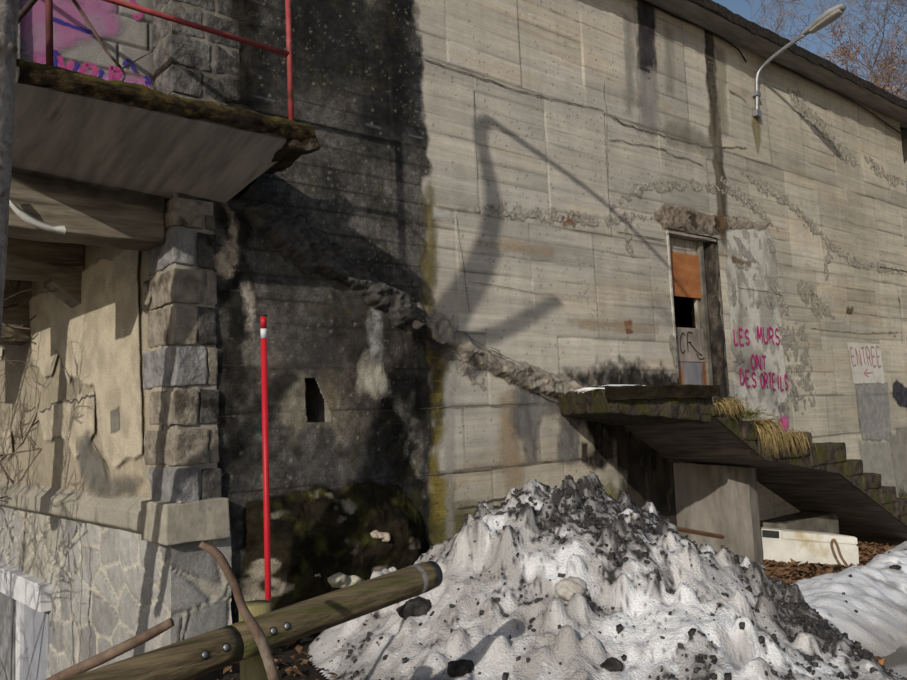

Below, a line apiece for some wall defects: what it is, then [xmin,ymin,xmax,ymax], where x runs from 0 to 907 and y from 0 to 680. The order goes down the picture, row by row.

crack [423,58,746,181]
leakage [625,0,672,134]
leakage [666,31,727,217]
flaking render [2,428,12,459]
flaking render [29,249,142,468]
leakage [11,168,169,209]
leakage [78,435,139,495]
leakage [178,0,456,624]
crack [421,402,534,410]
crack [450,217,555,372]
spalling [725,216,775,280]